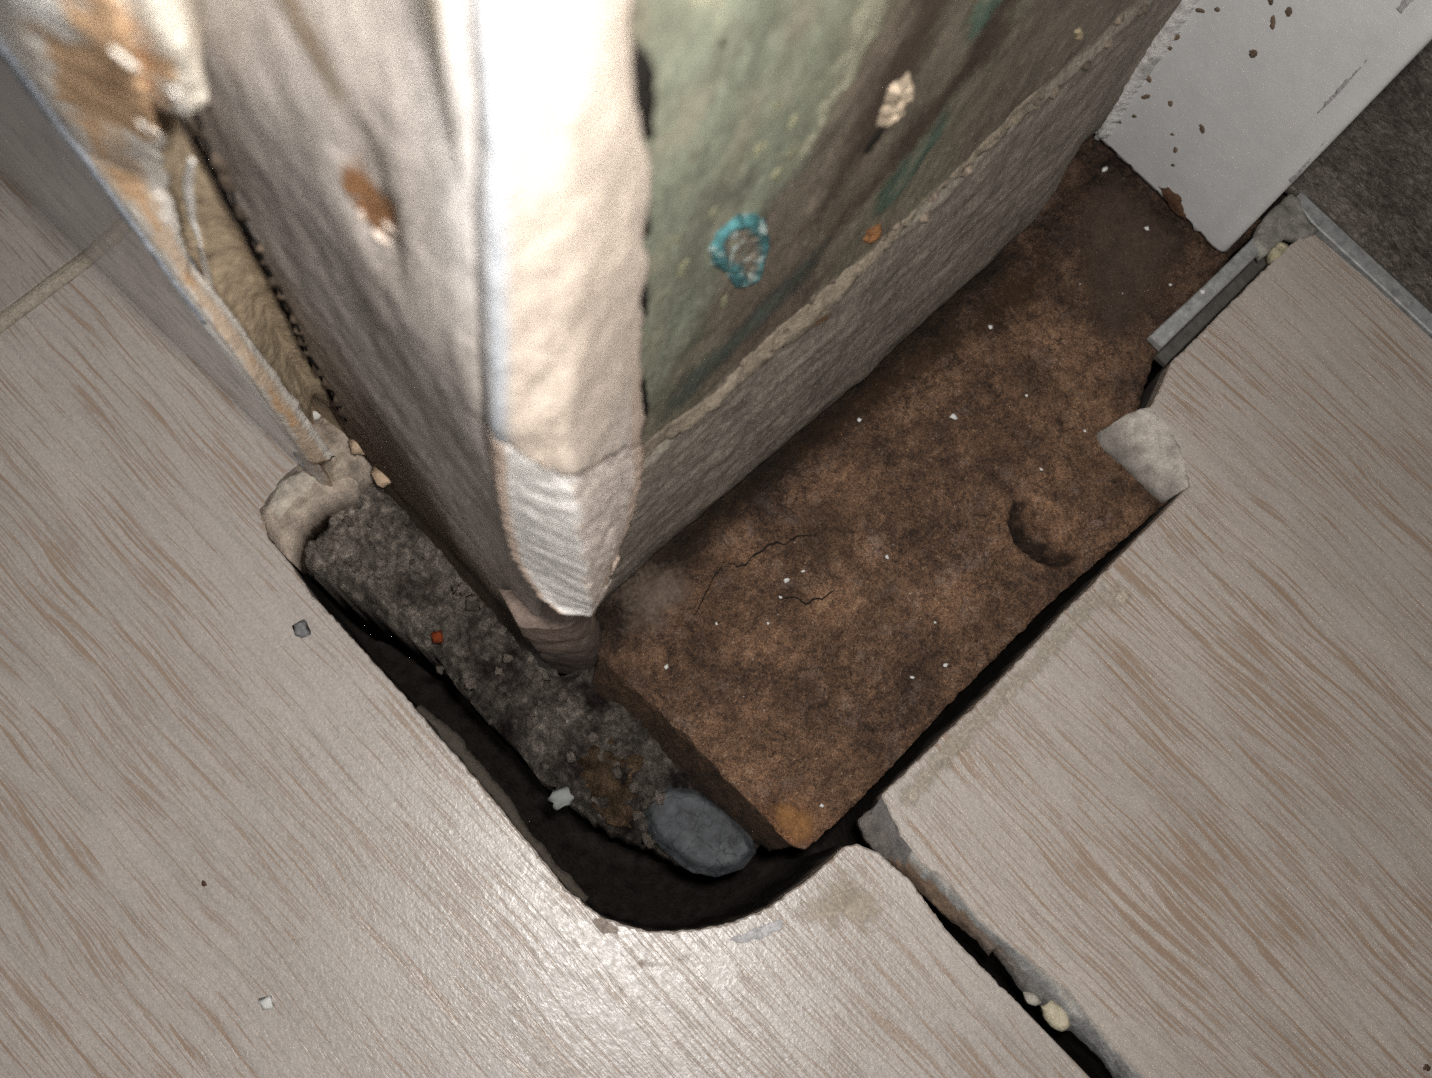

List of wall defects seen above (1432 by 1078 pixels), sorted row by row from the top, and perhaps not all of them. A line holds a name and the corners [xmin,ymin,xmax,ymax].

spalling [1268,0,1292,30]
peeling [1396,0,1414,14]
peeling [108,44,144,72]
peeling [168,86,190,119]
peeling [1317,60,1367,114]
spalling [341,169,402,245]
peeling [52,99,335,464]
crack [184,112,349,422]
spalling [468,0,1062,674]